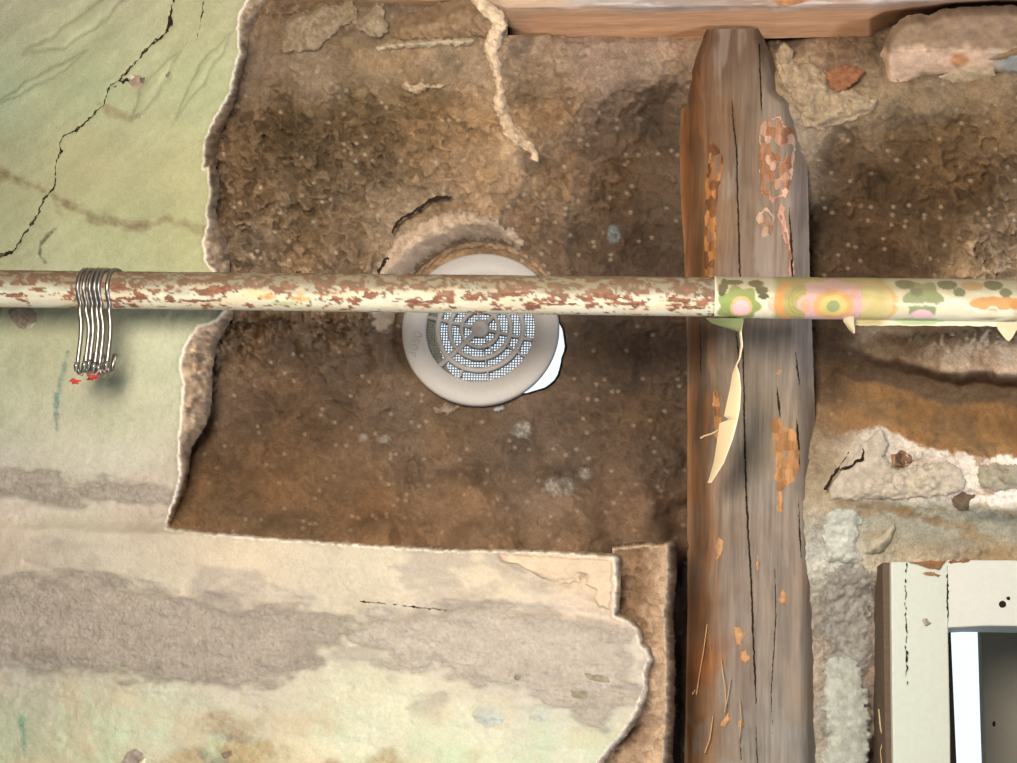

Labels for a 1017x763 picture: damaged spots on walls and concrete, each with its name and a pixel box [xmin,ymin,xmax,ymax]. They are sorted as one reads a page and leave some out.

crack [0,0,175,257]
flaking render [216,0,703,277]
flaking render [0,307,689,763]